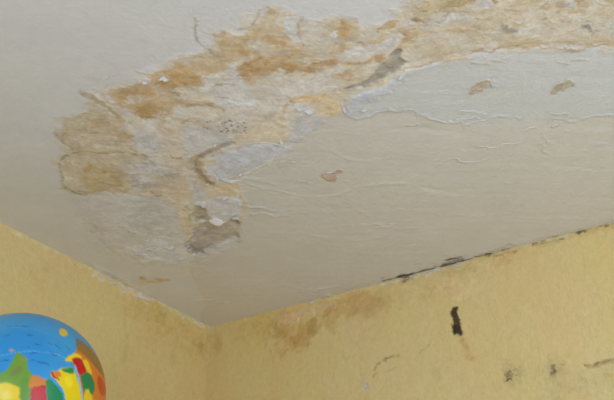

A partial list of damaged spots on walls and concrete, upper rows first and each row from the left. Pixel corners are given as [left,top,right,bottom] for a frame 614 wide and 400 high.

peeling [339,47,414,118]
peeling [468,78,494,95]
peeling [550,78,576,95]
peeling [213,141,293,184]
water stain [42,0,614,288]
spalling [182,195,244,263]
water stain [109,222,614,371]